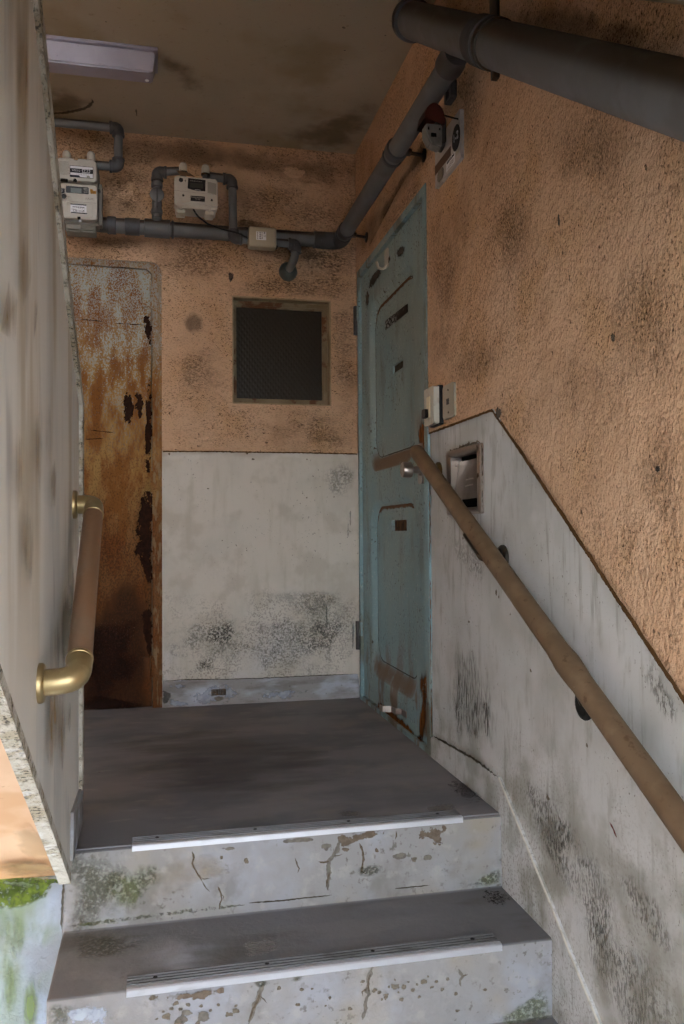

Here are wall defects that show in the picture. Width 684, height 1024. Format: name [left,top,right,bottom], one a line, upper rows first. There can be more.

corrosion [143,316,152,345]
corrosion [123,380,152,472]
corrosion [134,491,152,583]
corrosion [141,600,153,657]
corrosion [86,625,141,710]
corrosion [378,582,432,741]
peeling [283,831,384,852]
peeling [393,825,447,862]
crack [191,852,224,909]
water stain [528,788,655,1024]
spalling [149,987,240,1024]